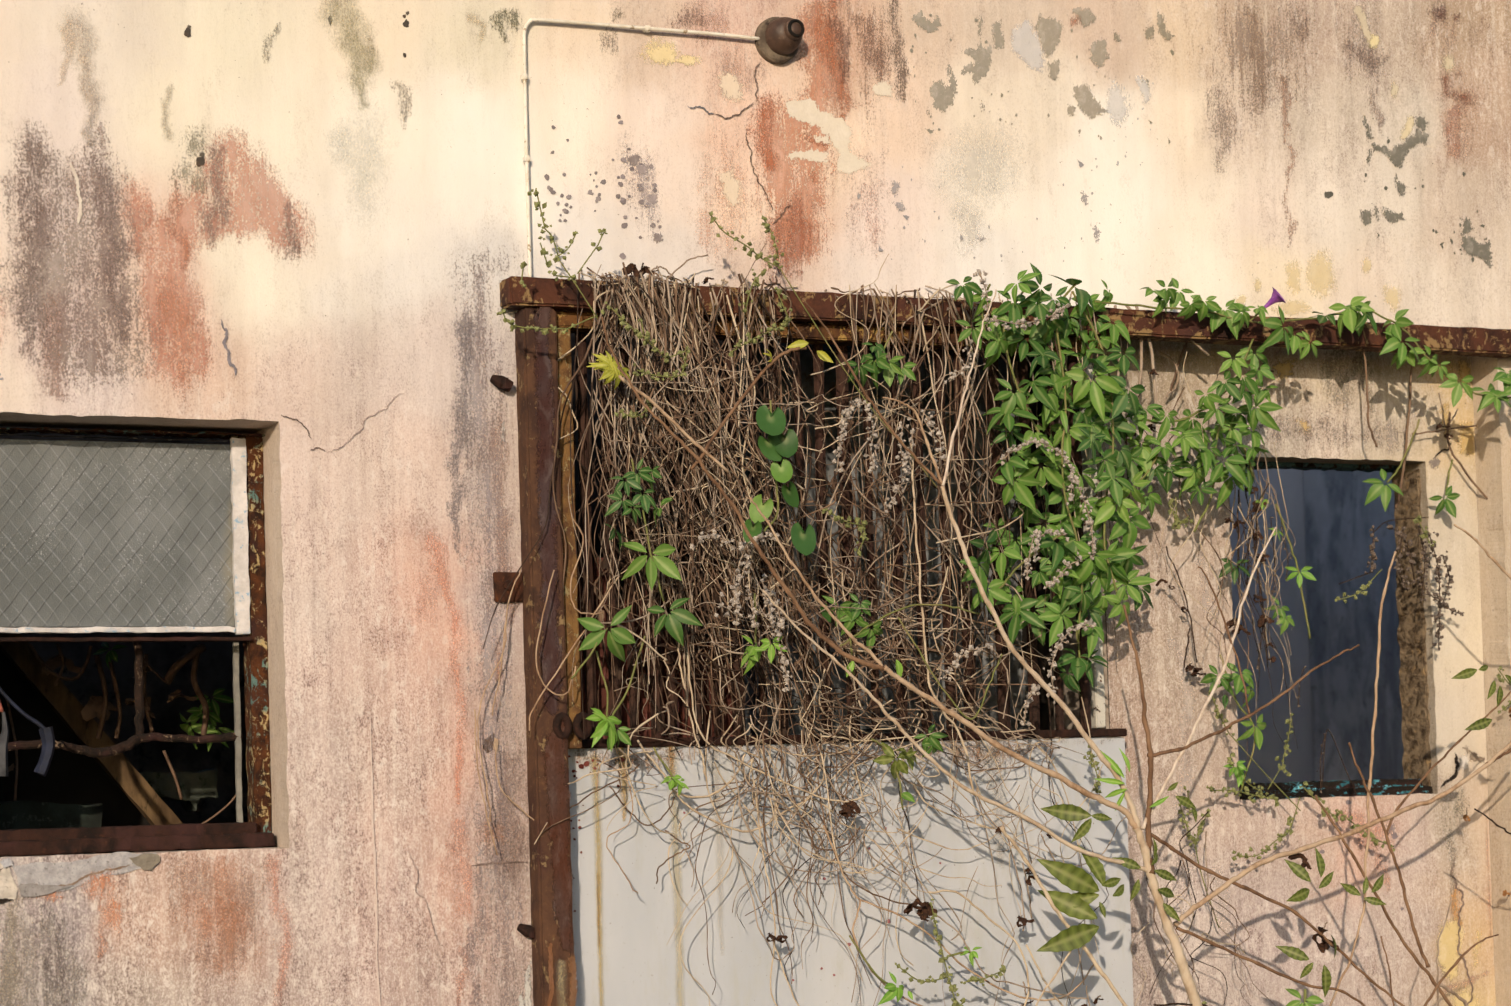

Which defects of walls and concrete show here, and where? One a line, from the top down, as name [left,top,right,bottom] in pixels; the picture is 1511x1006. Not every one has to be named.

water stain [0,38,160,399]
rust [671,11,721,27]
crack [688,63,792,223]
rust [747,0,854,280]
peeling [910,7,1153,166]
peeling [1359,115,1429,238]
peeling [1432,210,1493,268]
crack [283,391,406,452]
water stain [446,251,525,1005]
rust [533,306,683,1006]
rust [902,739,1049,767]
flaking render [0,852,160,904]